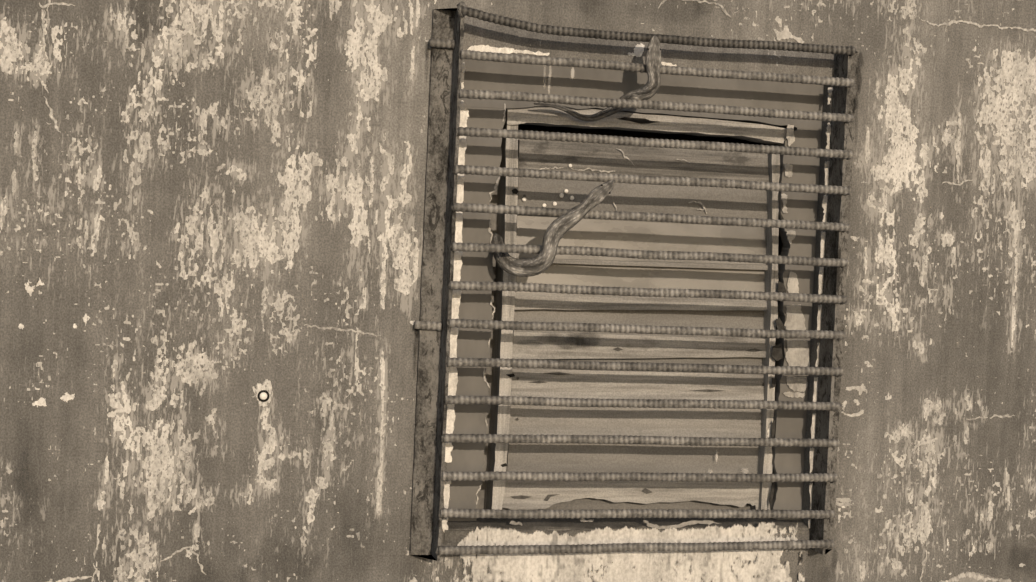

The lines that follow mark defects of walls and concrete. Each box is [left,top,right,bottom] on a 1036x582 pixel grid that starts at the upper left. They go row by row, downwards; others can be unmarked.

spalling [467,41,550,56]
crack [921,19,1036,32]
peeling [714,0,1036,361]
spalling [445,62,469,463]
spalling [783,123,831,528]
spalling [841,359,894,419]
peeling [835,376,1036,581]
spalling [442,480,451,533]
peeling [644,520,722,529]
crack [46,563,102,582]
crack [161,546,206,575]
crack [920,551,1021,582]